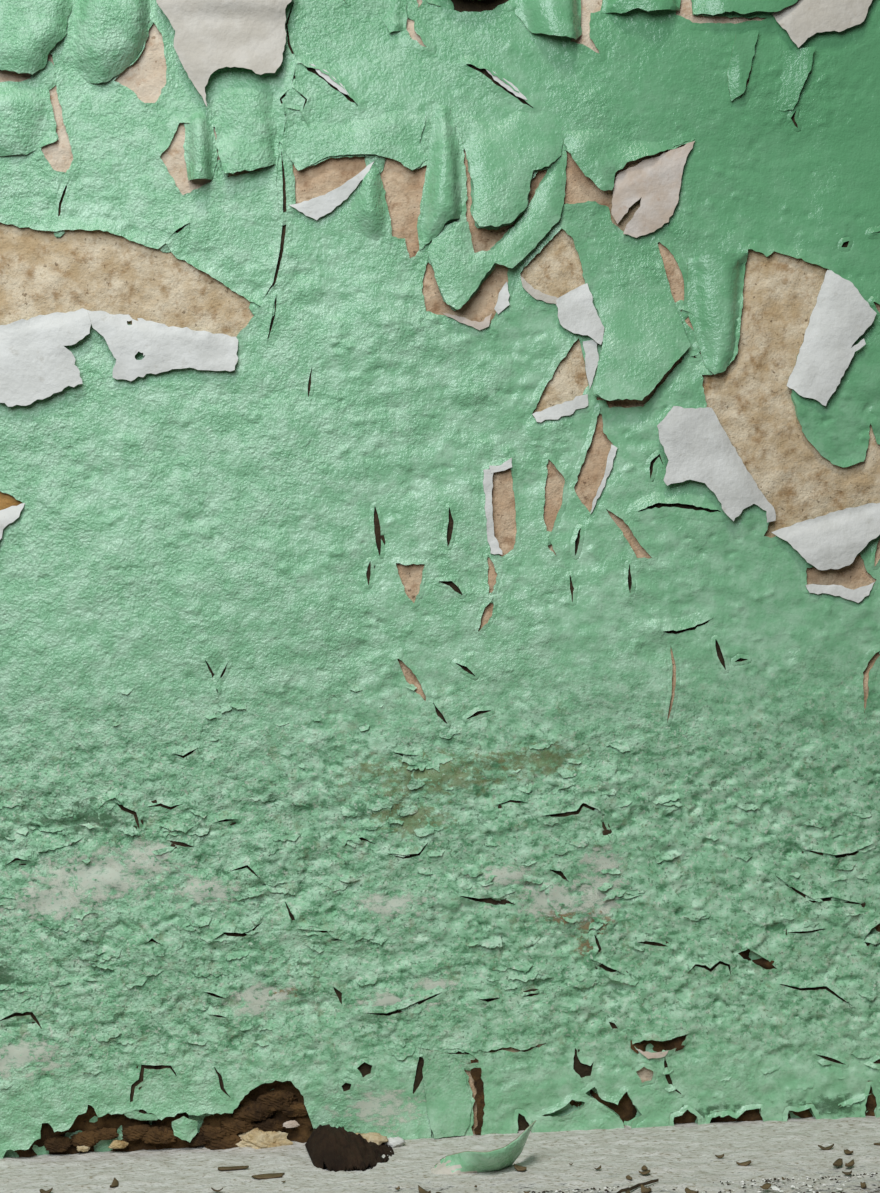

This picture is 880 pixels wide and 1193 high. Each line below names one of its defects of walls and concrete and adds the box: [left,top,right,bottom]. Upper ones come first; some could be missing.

peeling [0,0,880,720]
crack [91,789,246,854]
crack [202,857,350,950]
crack [769,837,878,940]
crack [583,928,738,982]
crack [326,980,547,1099]
spalling [0,1072,320,1159]
crack [124,1058,235,1121]
spalling [669,1104,768,1126]
spalling [782,1104,820,1121]
spalling [838,1049,880,1118]
peeling [218,1166,285,1179]